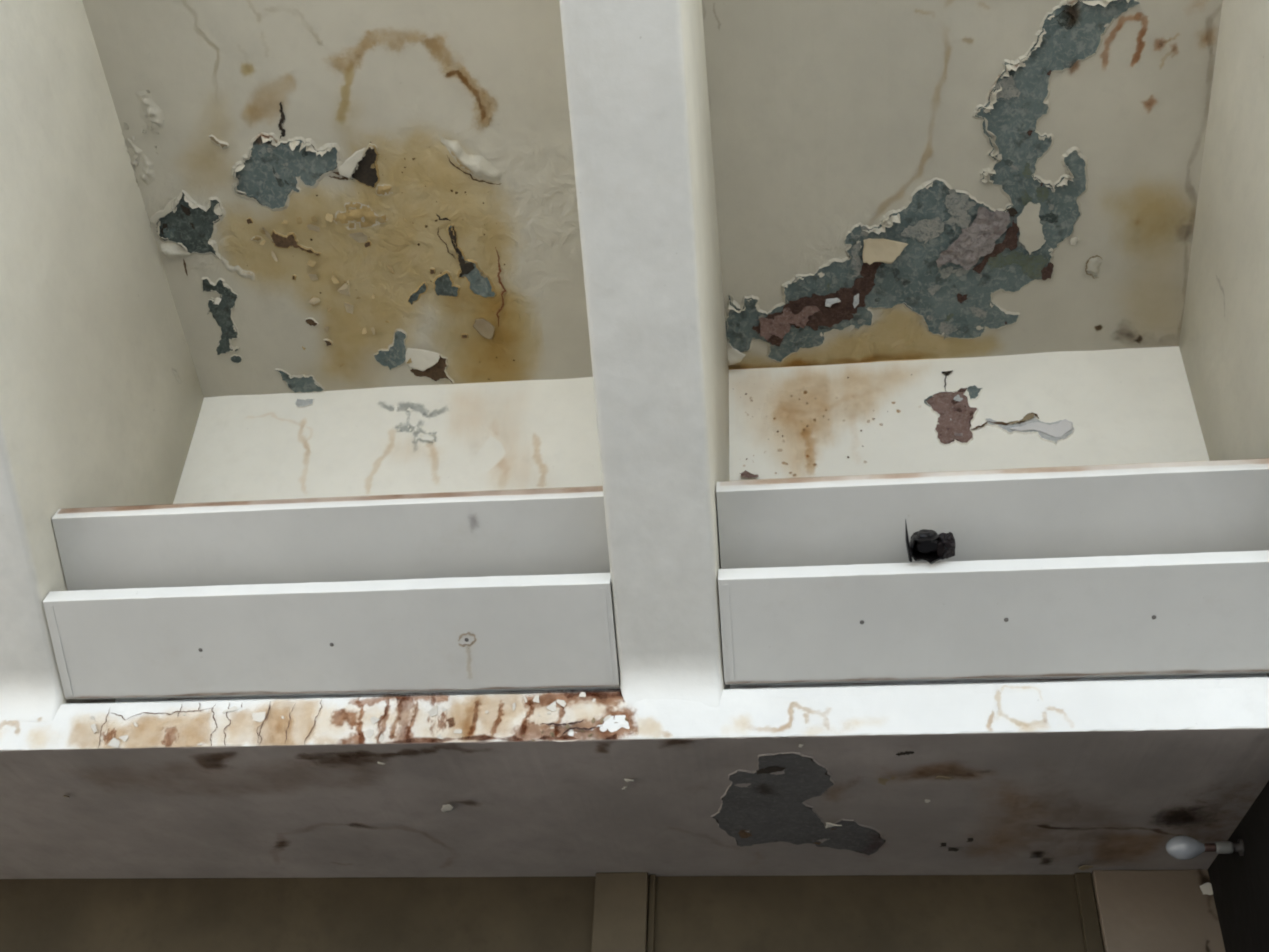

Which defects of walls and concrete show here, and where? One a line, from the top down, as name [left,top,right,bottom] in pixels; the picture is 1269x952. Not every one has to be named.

peeling [231,102,381,211]
peeling [725,0,1140,366]
peeling [150,190,243,364]
peeling [270,230,321,256]
peeling [407,214,497,305]
peeling [275,368,325,408]
peeling [373,329,455,383]
peeling [924,371,1075,446]
rust [107,722,138,748]
rust [252,696,279,722]
rust [339,692,455,755]
spalling [711,752,886,856]